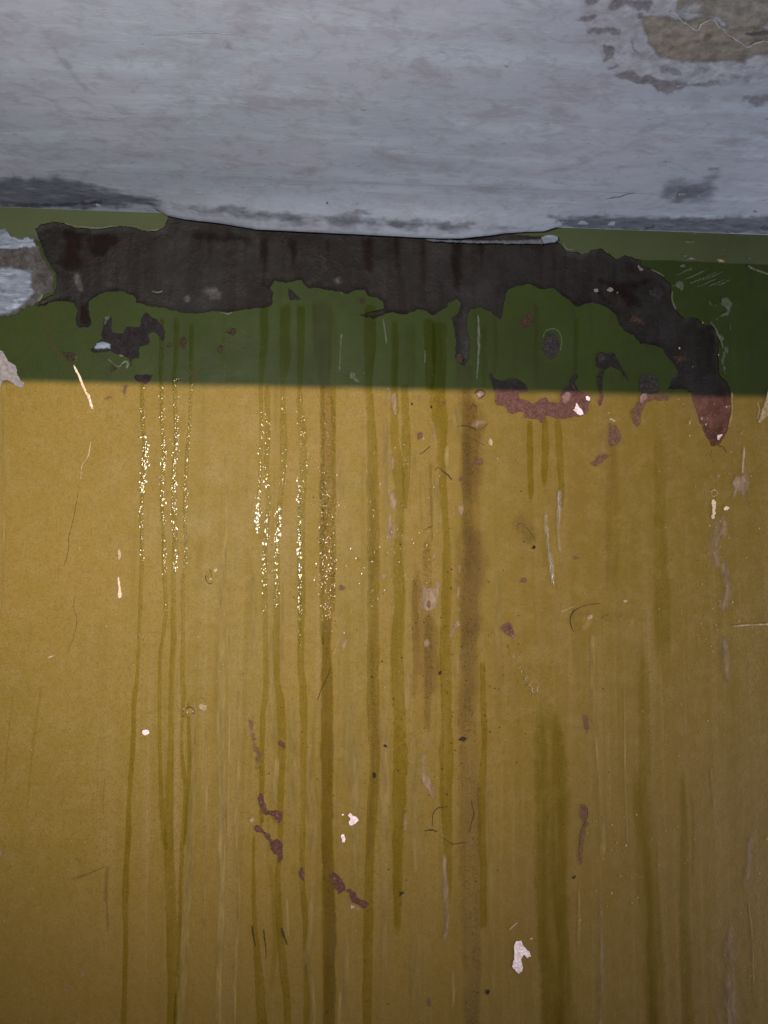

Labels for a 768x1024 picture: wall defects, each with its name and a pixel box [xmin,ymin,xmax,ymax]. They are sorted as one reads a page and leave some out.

leakage [0,178,154,209]
leakage [247,213,301,221]
leakage [560,211,768,234]
leakage [470,315,480,379]
flaking render [0,216,752,567]
peeling [509,923,533,973]